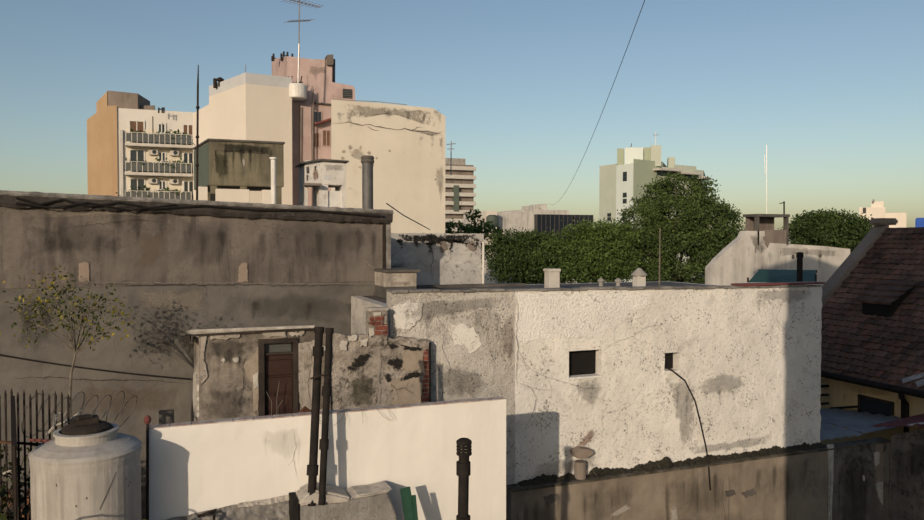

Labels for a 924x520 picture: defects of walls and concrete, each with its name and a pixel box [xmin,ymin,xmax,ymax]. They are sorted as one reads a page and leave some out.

crack [338,121,443,136]
leakage [397,234,482,269]
spalling [339,301,423,351]
spalling [449,323,482,353]
peeling [193,334,240,418]
peeling [221,348,259,412]
peeling [263,331,315,410]
peeling [390,349,429,405]